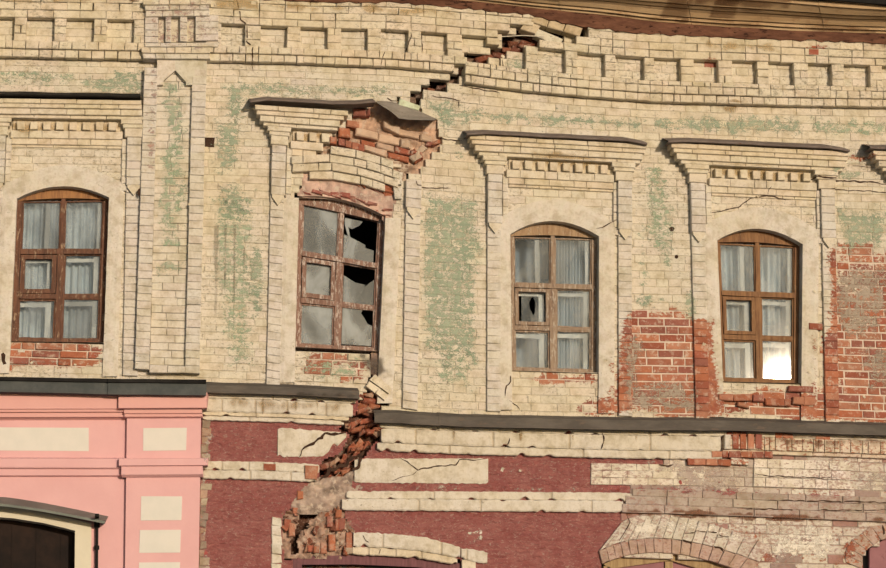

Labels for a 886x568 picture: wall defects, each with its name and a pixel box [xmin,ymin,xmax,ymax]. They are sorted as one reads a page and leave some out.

crack [712,186,790,213]
crack [811,163,886,193]
spalling [205,79,886,389]
spalling [570,167,706,414]
peeling [836,202,886,423]
spalling [1,343,104,373]
spalling [718,323,825,417]
crack [299,345,388,480]
crack [393,457,481,481]
spalling [646,432,773,496]
crack [284,514,381,568]
peeling [760,521,856,567]